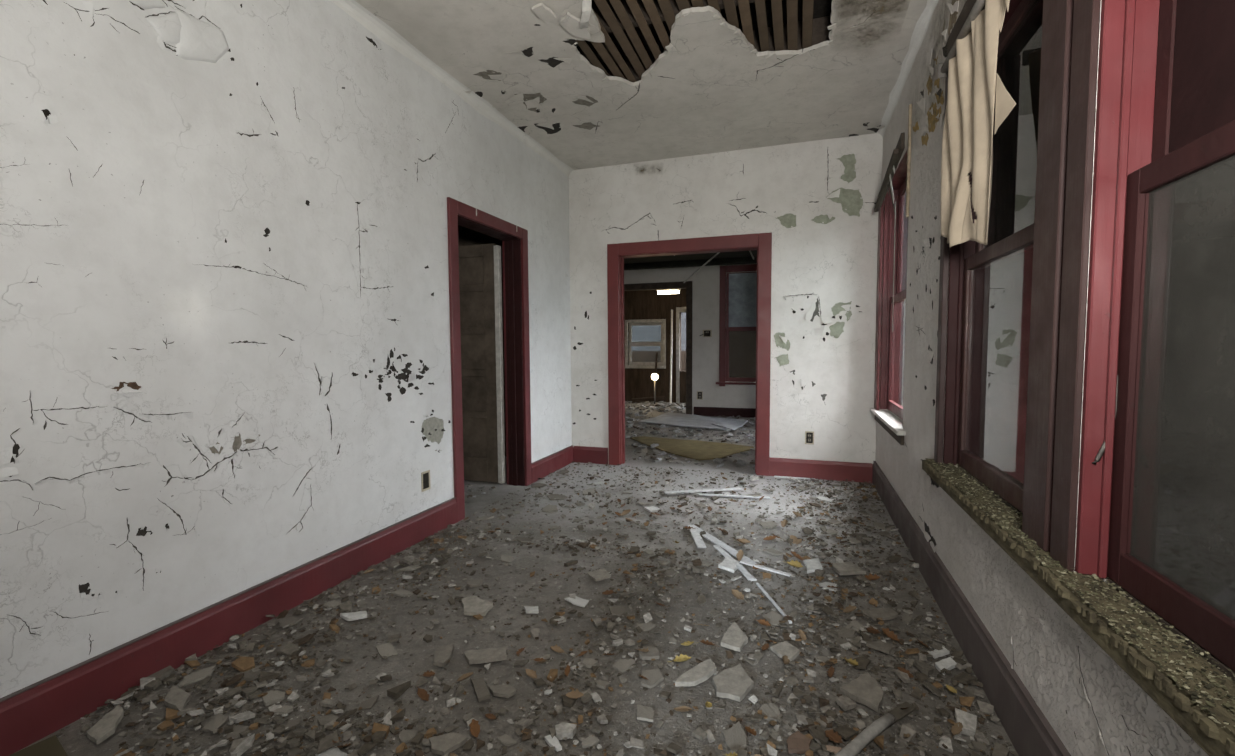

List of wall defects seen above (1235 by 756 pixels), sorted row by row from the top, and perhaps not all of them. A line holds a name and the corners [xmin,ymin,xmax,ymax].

crack [235,94,300,138]
peeling [465,70,600,134]
spalling [504,0,837,82]
peeling [913,0,959,146]
peeling [765,210,797,229]
peeling [812,154,864,224]
crack [232,334,294,357]
peeling [351,347,434,402]
peeling [805,294,853,338]
crack [285,363,340,535]
crack [0,390,279,593]
crack [4,608,109,654]